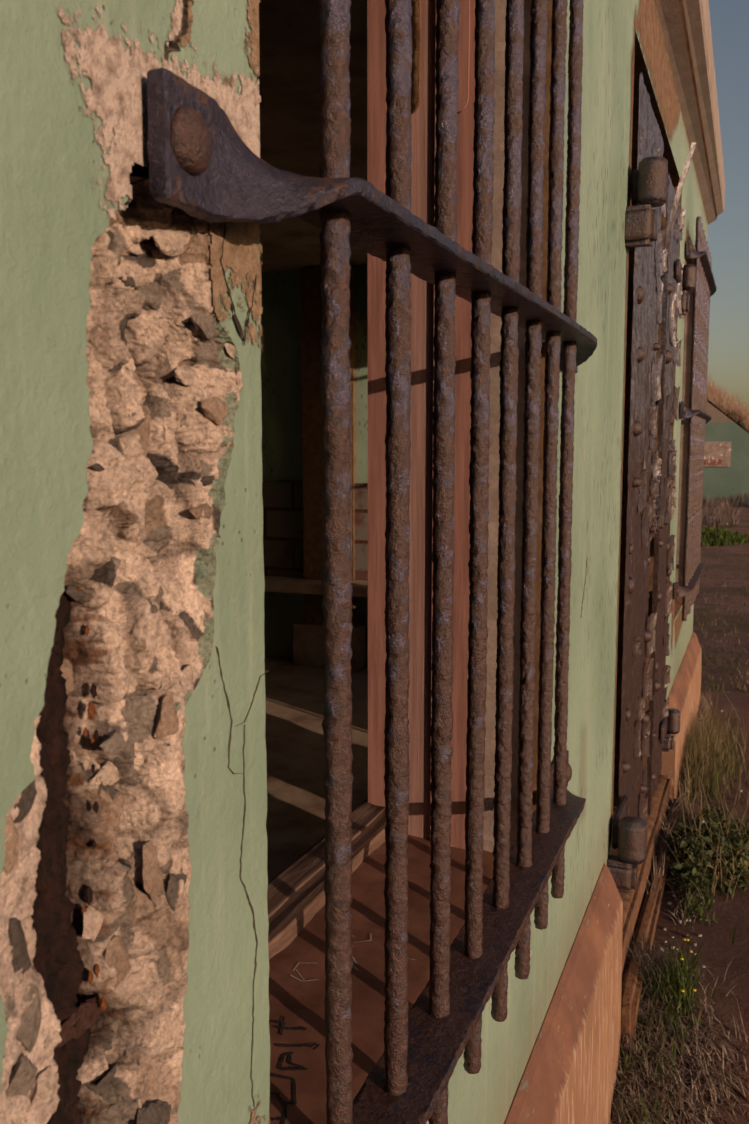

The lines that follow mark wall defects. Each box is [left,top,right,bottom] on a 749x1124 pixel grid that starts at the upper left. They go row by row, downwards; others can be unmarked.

crack [162,0,194,62]
spalling [0,0,263,1124]
crack [216,646,269,1107]